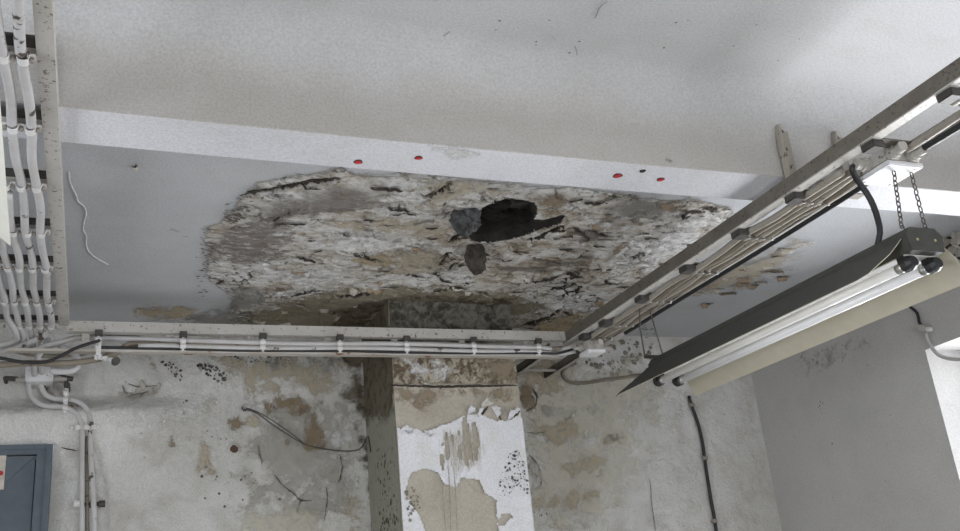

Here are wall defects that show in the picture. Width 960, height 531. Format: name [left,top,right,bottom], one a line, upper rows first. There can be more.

flaking render [202,167,732,332]
leakage [197,325,663,531]
peeling [392,347,538,531]